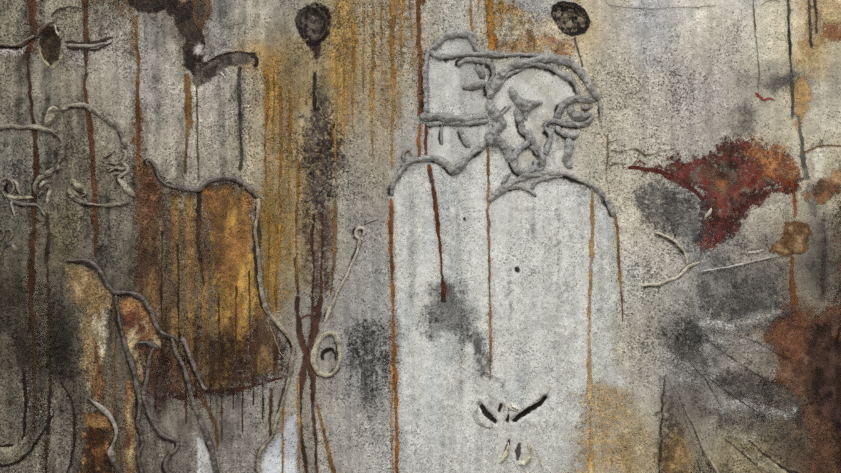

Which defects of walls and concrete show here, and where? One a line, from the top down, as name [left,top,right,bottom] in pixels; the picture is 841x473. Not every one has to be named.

rust [24,0,53,440]
water stain [128,0,260,170]
rust [64,0,336,473]
spalling [295,2,331,59]
water stain [341,313,401,421]
rust [325,0,446,302]
spalling [507,0,592,66]
rust [564,191,700,473]
rust [628,136,841,473]
water stain [766,0,835,300]